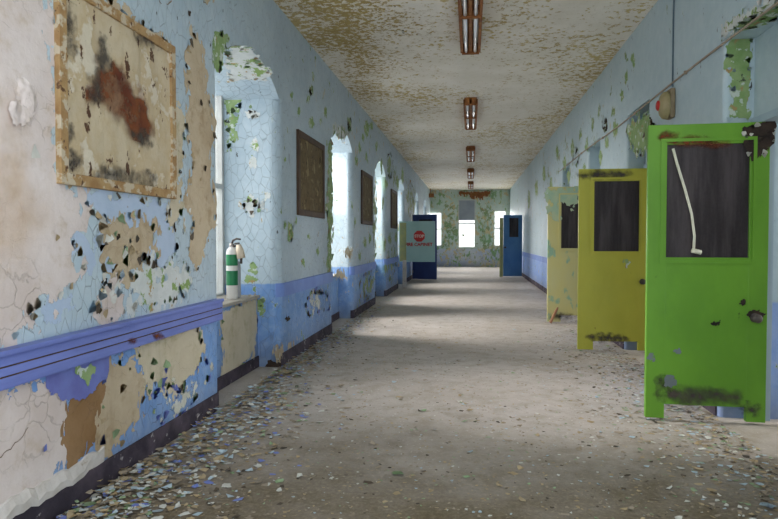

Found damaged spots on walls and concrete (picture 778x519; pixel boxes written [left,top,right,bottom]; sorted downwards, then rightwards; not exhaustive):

flaking render [0,0,273,348]
peeling [277,0,431,304]
peeling [721,0,778,161]
flaking render [95,262,266,458]
peeling [305,287,331,318]